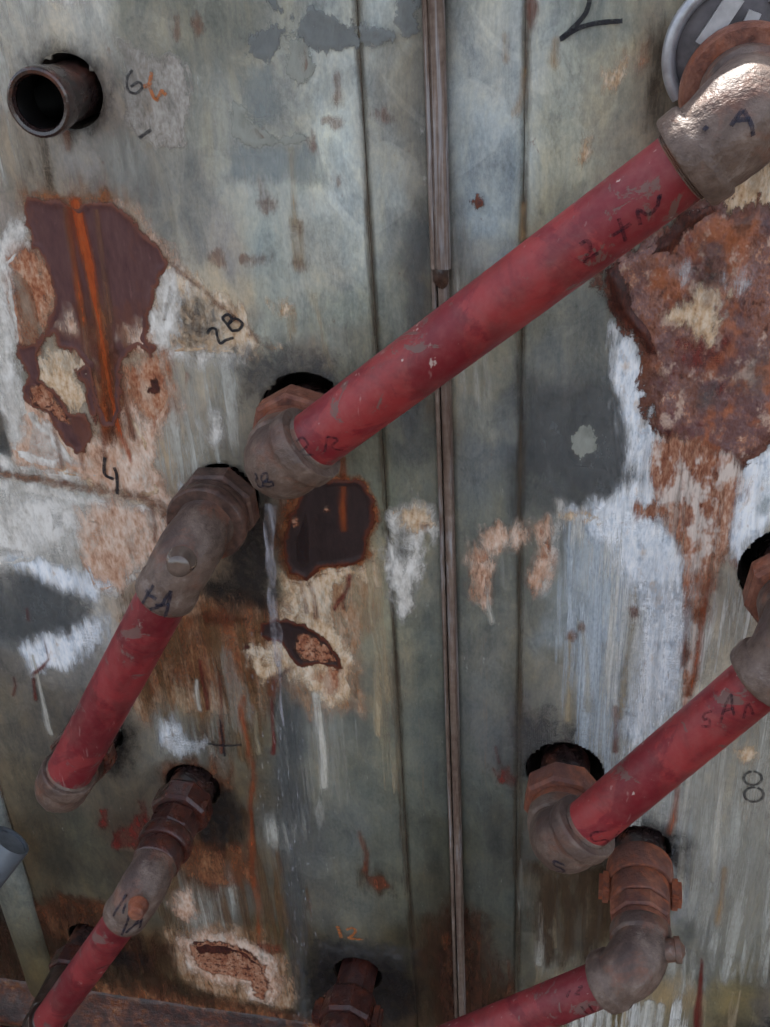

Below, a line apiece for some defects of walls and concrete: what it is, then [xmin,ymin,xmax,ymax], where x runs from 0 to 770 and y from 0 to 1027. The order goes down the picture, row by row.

peeling [248,0,422,63]
efflorescence [0,454,167,603]
corrosion [0,187,180,512]
corrosion [133,460,390,762]
peeling [466,499,564,622]
damp [559,494,752,775]
corrosion [568,165,770,706]
damp [529,862,610,967]
efflorescence [569,1000,686,1027]
damp [667,714,770,983]